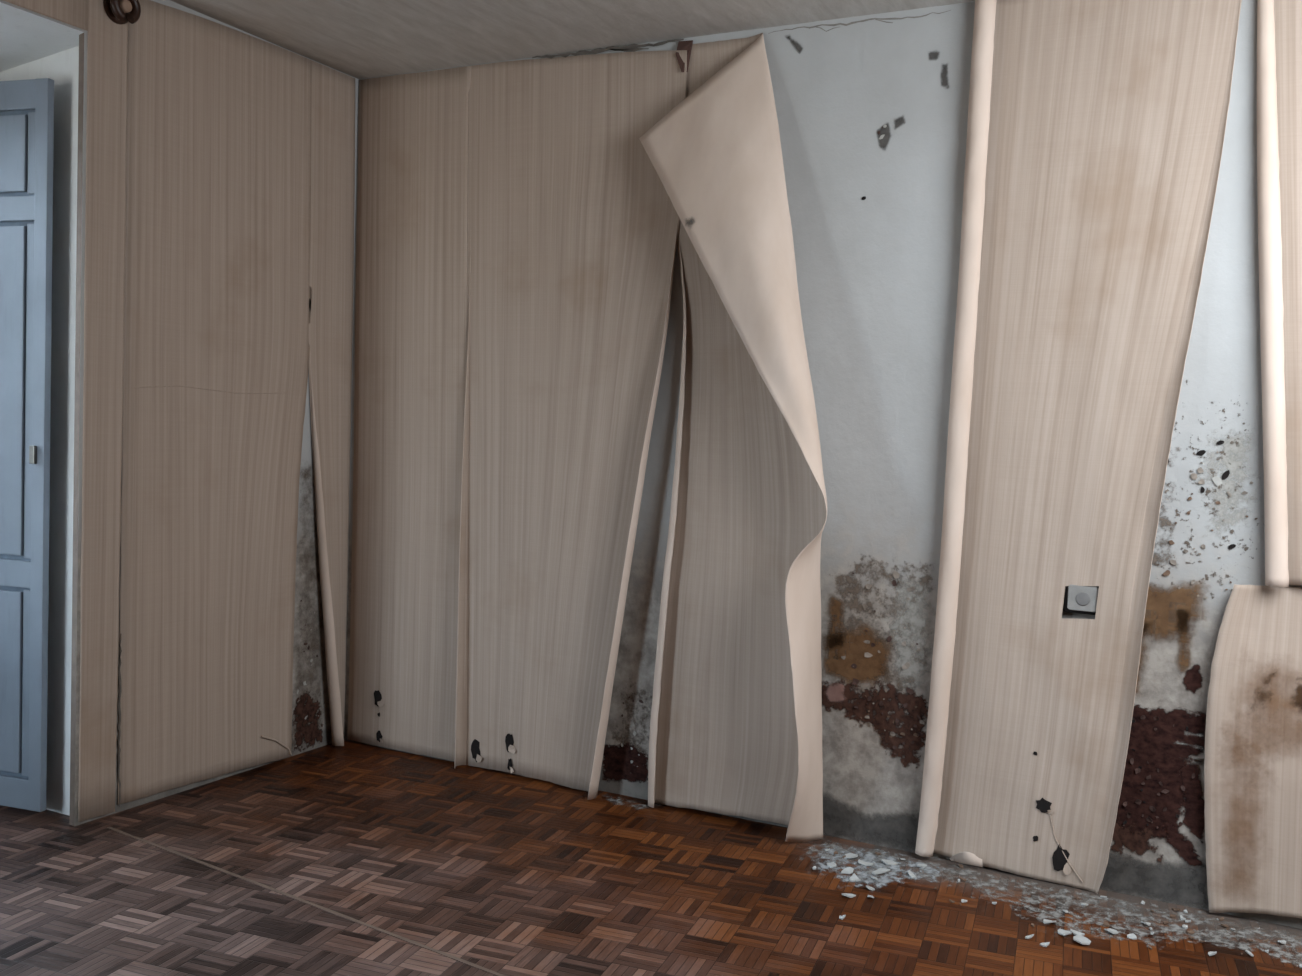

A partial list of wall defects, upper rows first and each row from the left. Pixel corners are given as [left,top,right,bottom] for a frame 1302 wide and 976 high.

peeling [1152,402,1258,599]
leakage [292,543,323,752]
leakage [824,597,890,683]
leakage [1111,584,1206,866]
leakage [1261,674,1302,707]